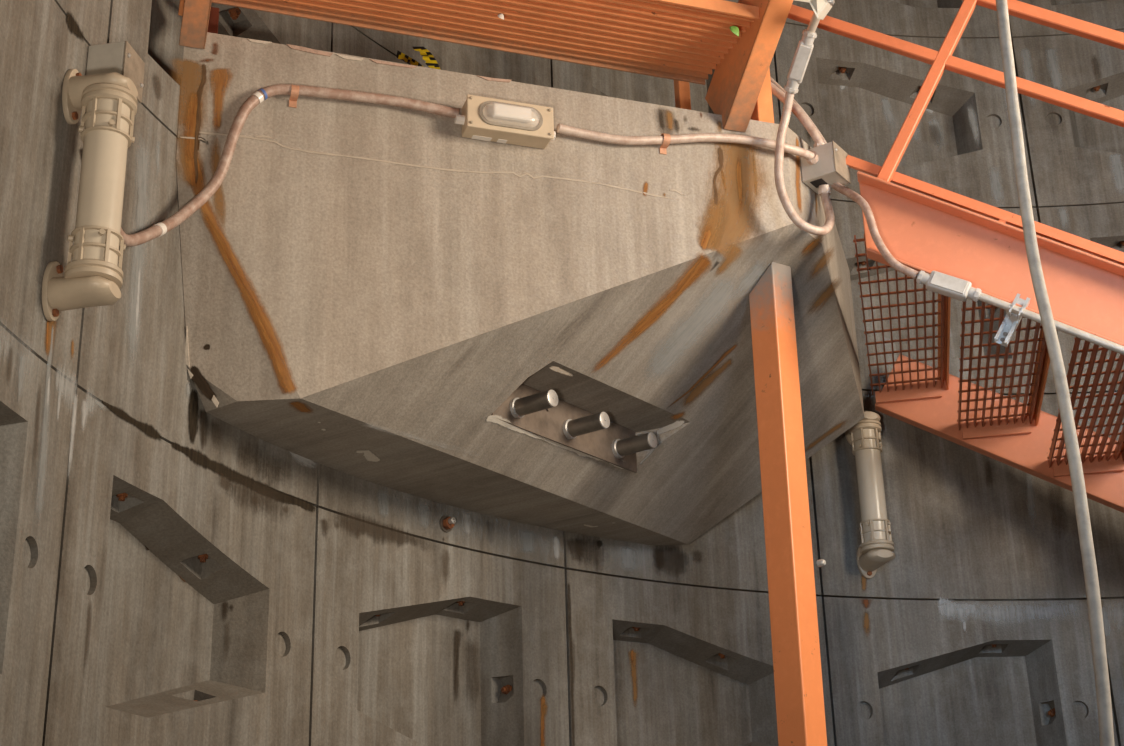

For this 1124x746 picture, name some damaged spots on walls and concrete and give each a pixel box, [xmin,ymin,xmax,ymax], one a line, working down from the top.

rust [174,43,311,413]
rust [596,121,763,369]